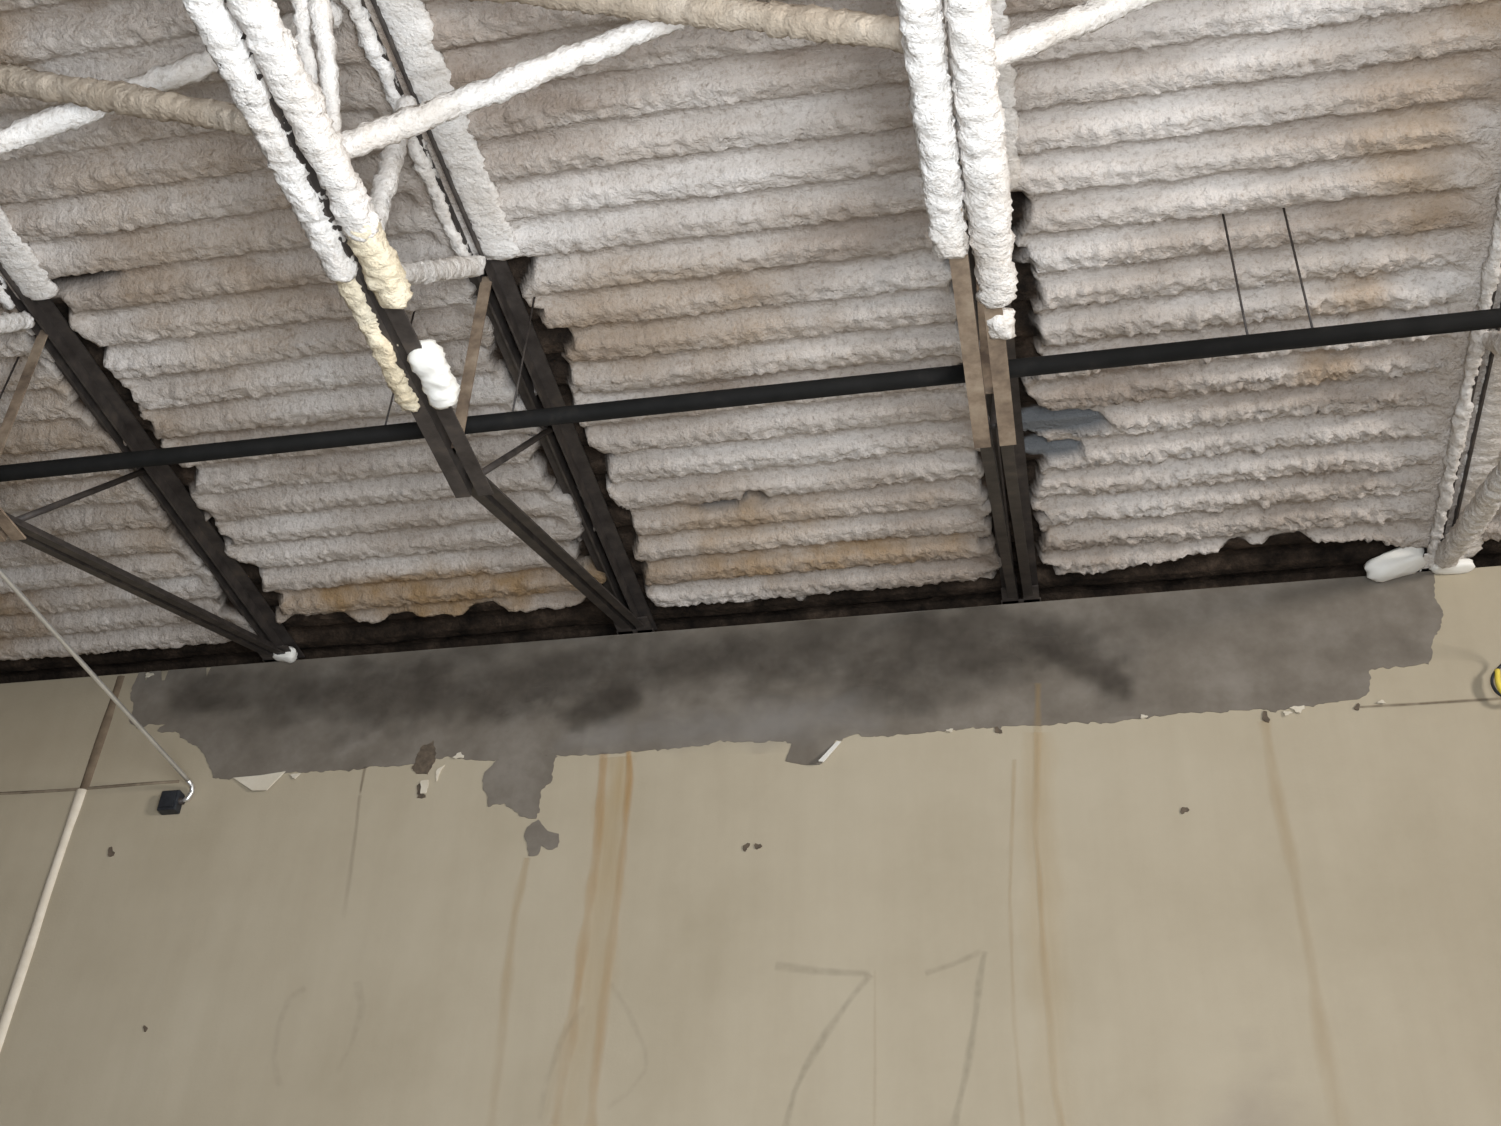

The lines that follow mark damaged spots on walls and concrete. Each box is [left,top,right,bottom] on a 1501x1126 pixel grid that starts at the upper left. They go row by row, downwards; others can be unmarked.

peeling [129,571,1444,856]